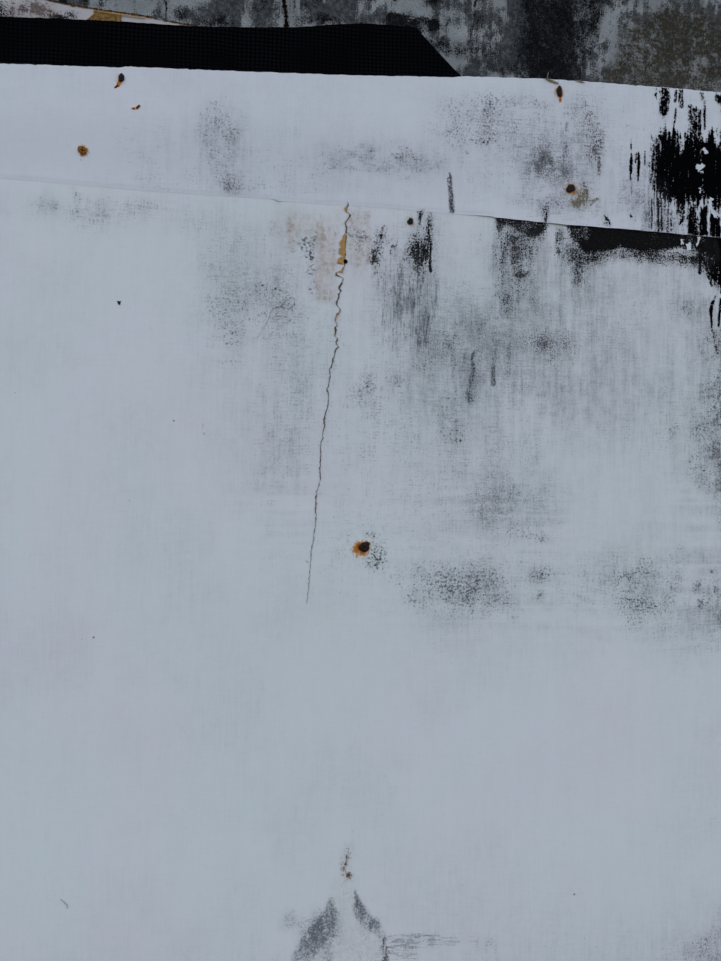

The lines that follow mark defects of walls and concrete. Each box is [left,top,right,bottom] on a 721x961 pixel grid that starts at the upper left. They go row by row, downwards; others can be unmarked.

corrosion [567,182,598,208]
peeling [629,87,721,354]
crack [307,203,351,598]
corrosion [352,541,371,557]
damp [294,901,342,961]
damp [354,893,389,961]